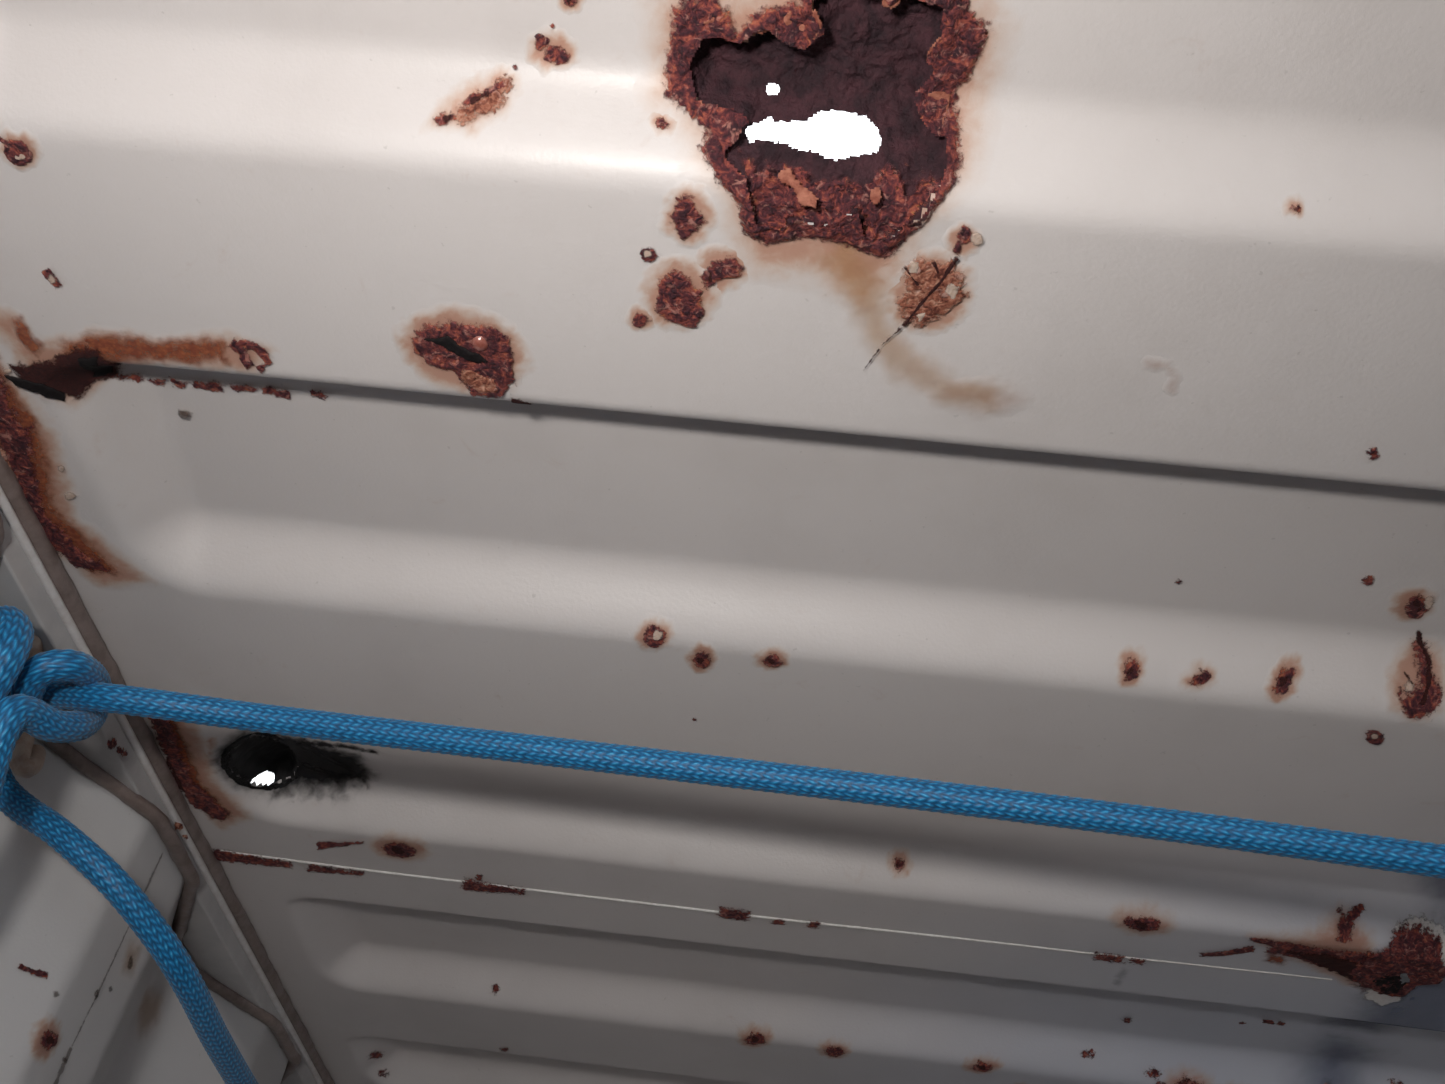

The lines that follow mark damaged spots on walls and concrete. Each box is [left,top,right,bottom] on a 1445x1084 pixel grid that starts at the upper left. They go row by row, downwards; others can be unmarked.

corrosion [417,0,587,142]
corrosion [622,0,1029,334]
corrosion [390,301,538,399]
corrosion [0,304,282,591]
corrosion [683,639,721,674]
corrosion [751,644,793,672]
corrosion [1112,643,1149,689]
corrosion [1261,649,1307,706]
corrosion [1380,584,1445,727]
corrosion [144,717,258,832]
corrosion [214,827,437,876]
corrosion [1199,896,1445,997]